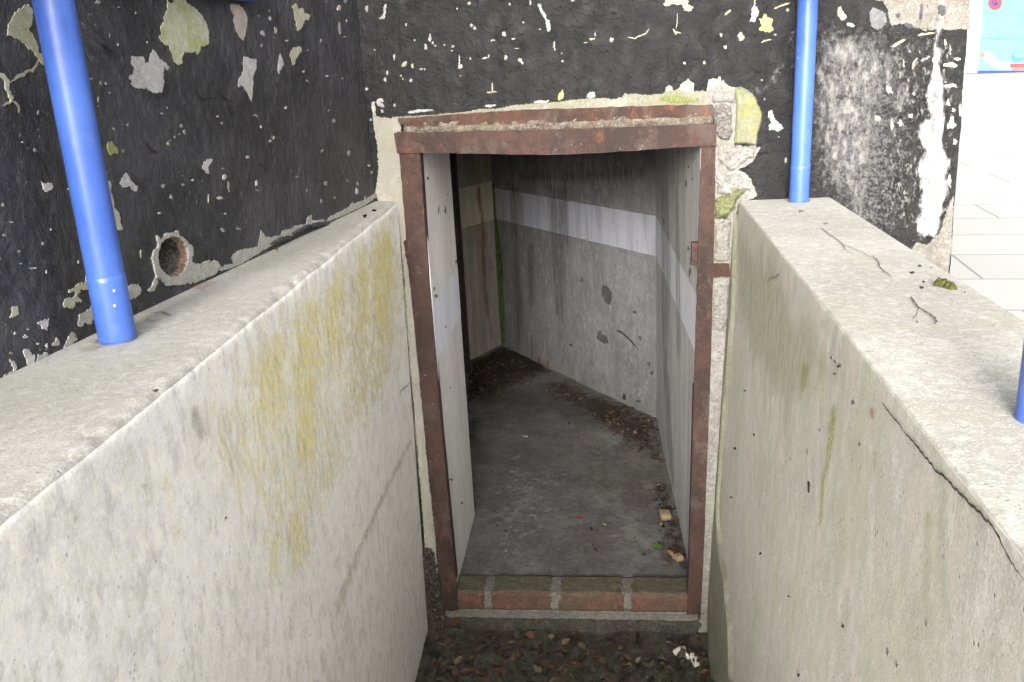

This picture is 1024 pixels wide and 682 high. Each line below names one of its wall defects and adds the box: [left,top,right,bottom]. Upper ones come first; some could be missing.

peeling [128,0,209,93]
peeling [238,57,257,101]
peeling [230,4,310,82]
peeling [663,0,693,12]
peeling [869,0,970,145]
rust [404,240,414,281]
crack [822,228,892,277]
peeling [4,278,94,377]
flaking render [113,75,760,632]
crack [911,297,938,326]
leakage [215,226,407,577]
crack [883,404,1024,580]